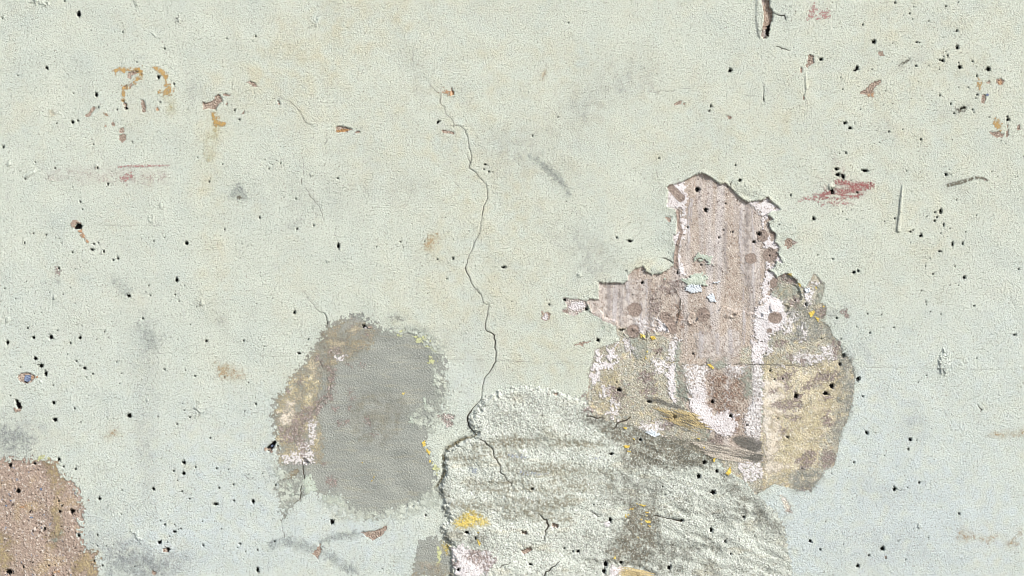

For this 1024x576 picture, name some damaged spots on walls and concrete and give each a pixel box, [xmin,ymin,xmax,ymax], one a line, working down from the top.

spalling [761,0,773,39]
crack [430,85,497,434]
peeling [541,173,859,512]
water stain [279,354,337,480]
peeling [0,454,102,576]